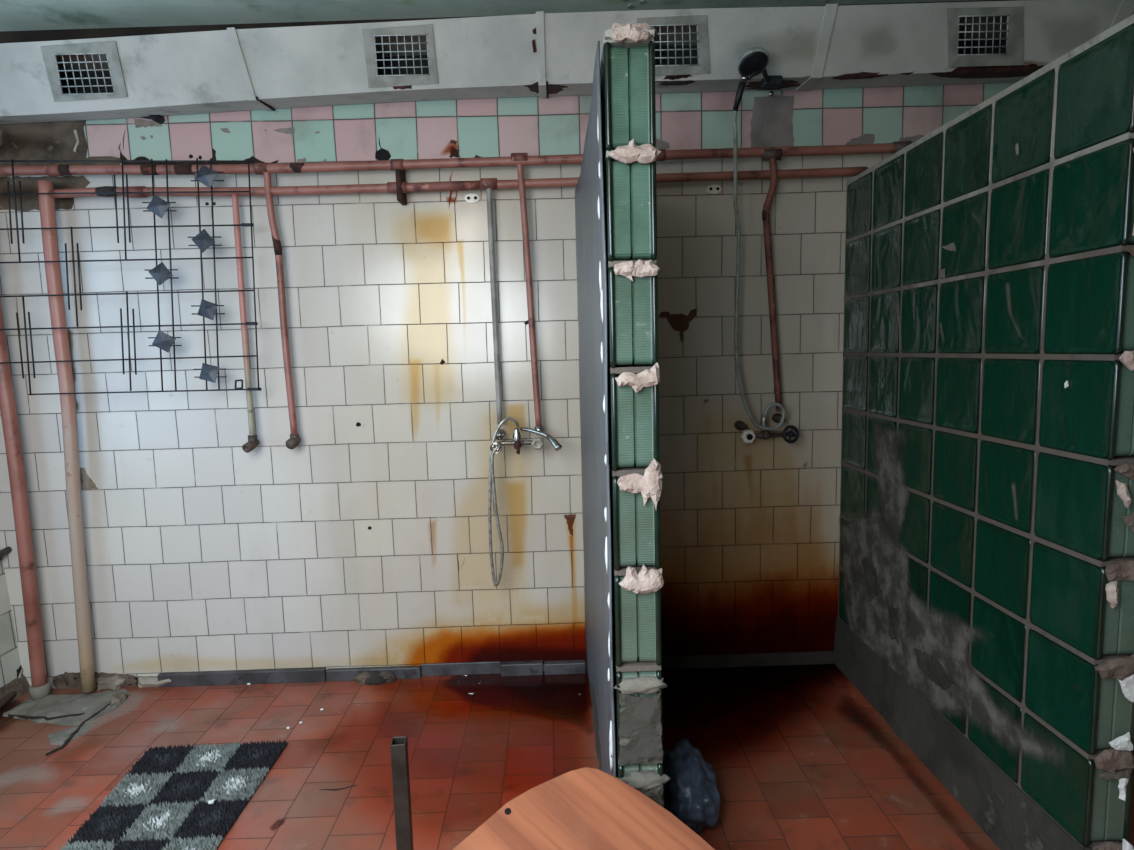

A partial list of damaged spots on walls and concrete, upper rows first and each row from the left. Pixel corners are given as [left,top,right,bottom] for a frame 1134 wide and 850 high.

rust [745,76,811,90]
rust [830,72,913,80]
rust [928,64,1044,79]
peeling [750,95,794,148]
flaking render [0,115,279,211]
rust [564,514,576,536]
rust [661,585,839,656]
rust [446,633,586,663]